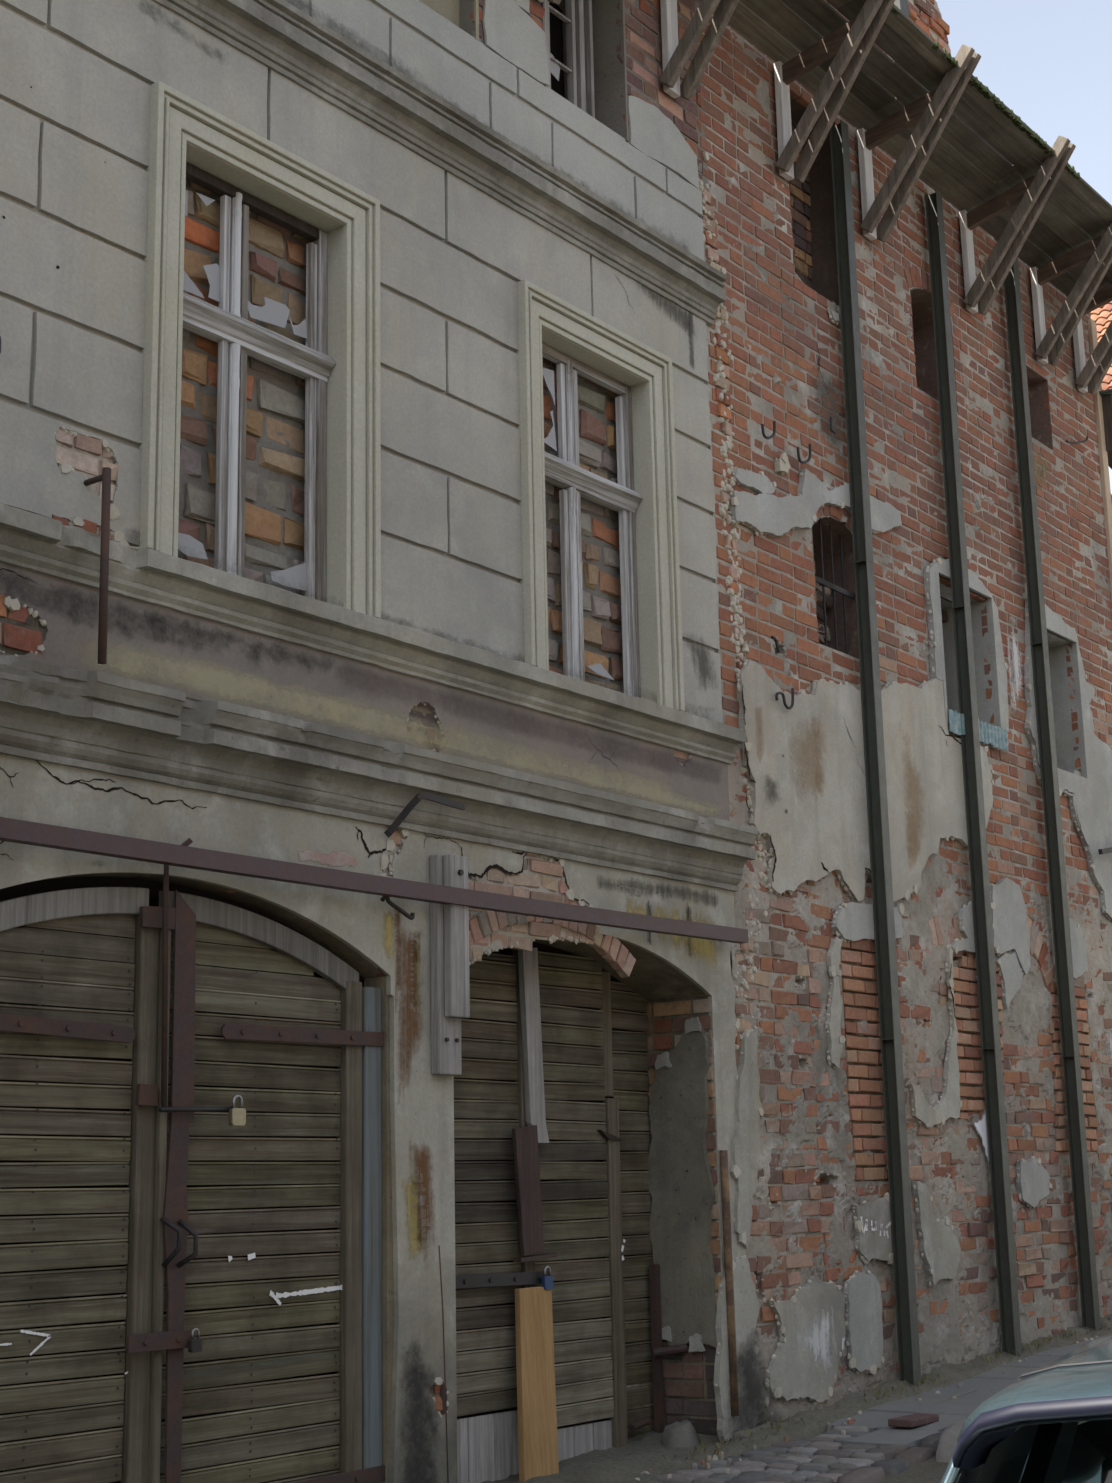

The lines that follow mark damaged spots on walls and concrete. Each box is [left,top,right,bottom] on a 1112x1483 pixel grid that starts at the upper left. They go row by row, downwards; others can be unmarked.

flaking render [52,426,130,547]
flaking render [870,496,902,534]
flaking render [0,594,47,657]
crack [0,760,207,809]
flaking render [881,557,968,939]
flaking render [968,569,1112,921]
rust [395,910,419,1072]
flaking render [468,852,636,978]
flaking render [647,303,893,1442]
flaking render [909,900,975,1129]
flaking render [990,877,1037,1010]
rust [414,1148,432,1249]